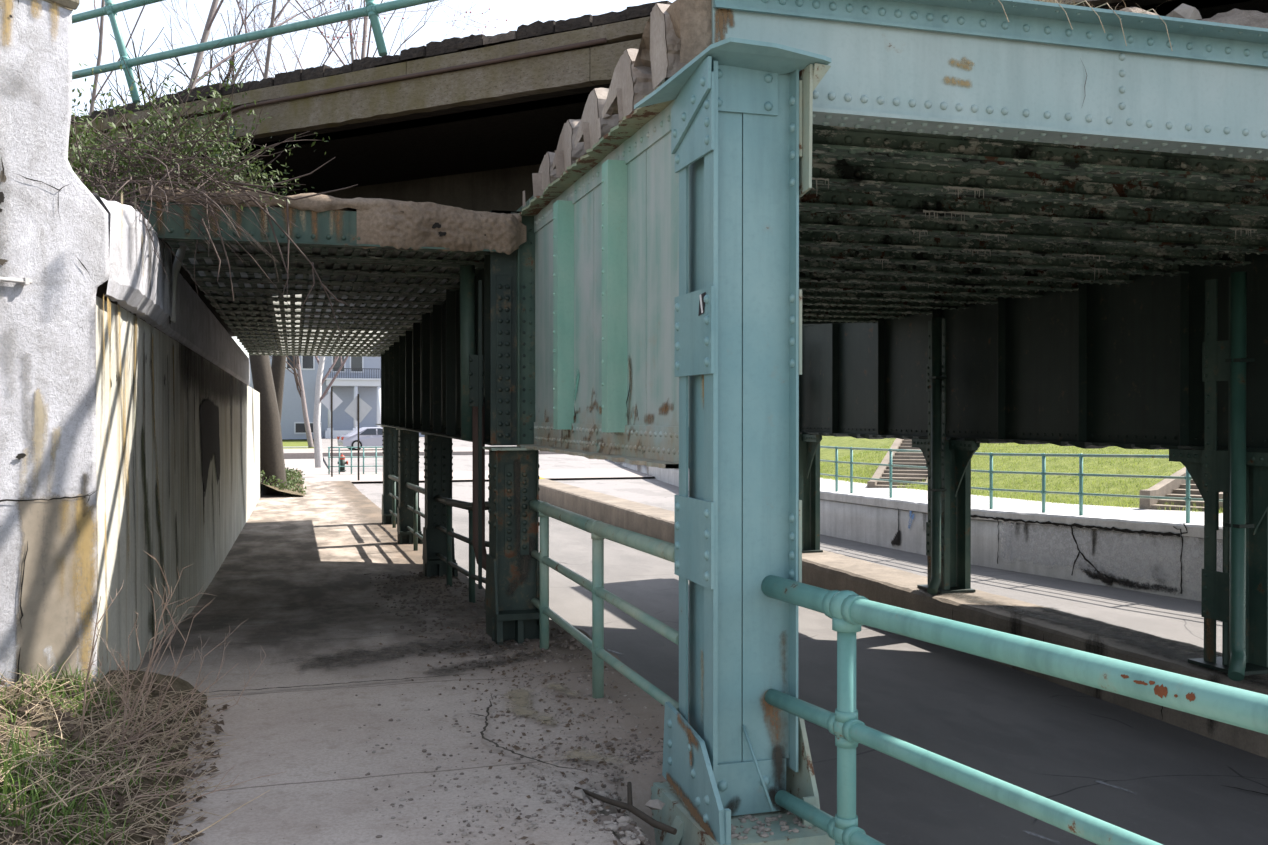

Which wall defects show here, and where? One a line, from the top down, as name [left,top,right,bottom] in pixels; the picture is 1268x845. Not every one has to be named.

rust [945,58,973,87]
crack [1,158,69,217]
leakage [133,334,145,517]
rust [628,403,672,448]
crack [0,490,96,503]
crack [971,515,1188,581]
crack [17,541,28,682]
rust [677,713,698,765]
rust [666,773,715,841]